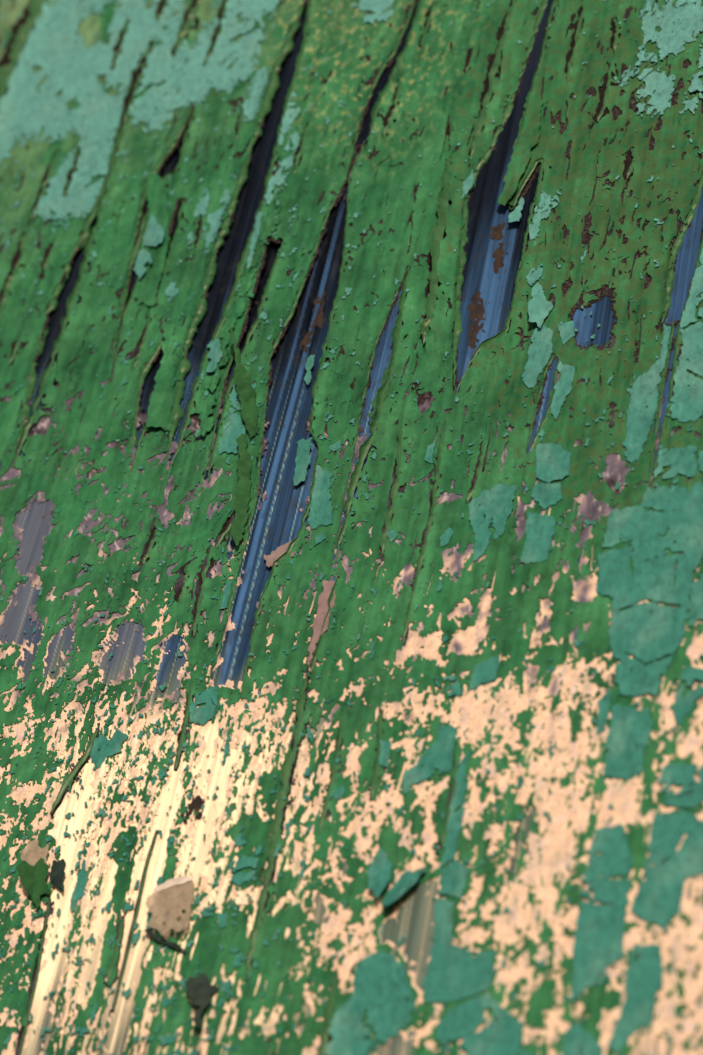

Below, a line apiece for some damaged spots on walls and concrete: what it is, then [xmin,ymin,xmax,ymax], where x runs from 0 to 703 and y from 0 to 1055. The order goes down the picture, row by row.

peeling [0,0,279,227]
peeling [134,171,179,307]
peeling [247,92,301,268]
peeling [497,91,559,246]
peeling [615,0,703,118]
peeling [146,323,176,432]
peeling [148,475,193,529]
peeling [206,327,259,609]
peeling [0,500,78,697]
peeling [95,621,146,690]
peeling [291,247,703,1055]
peeling [0,634,286,1055]